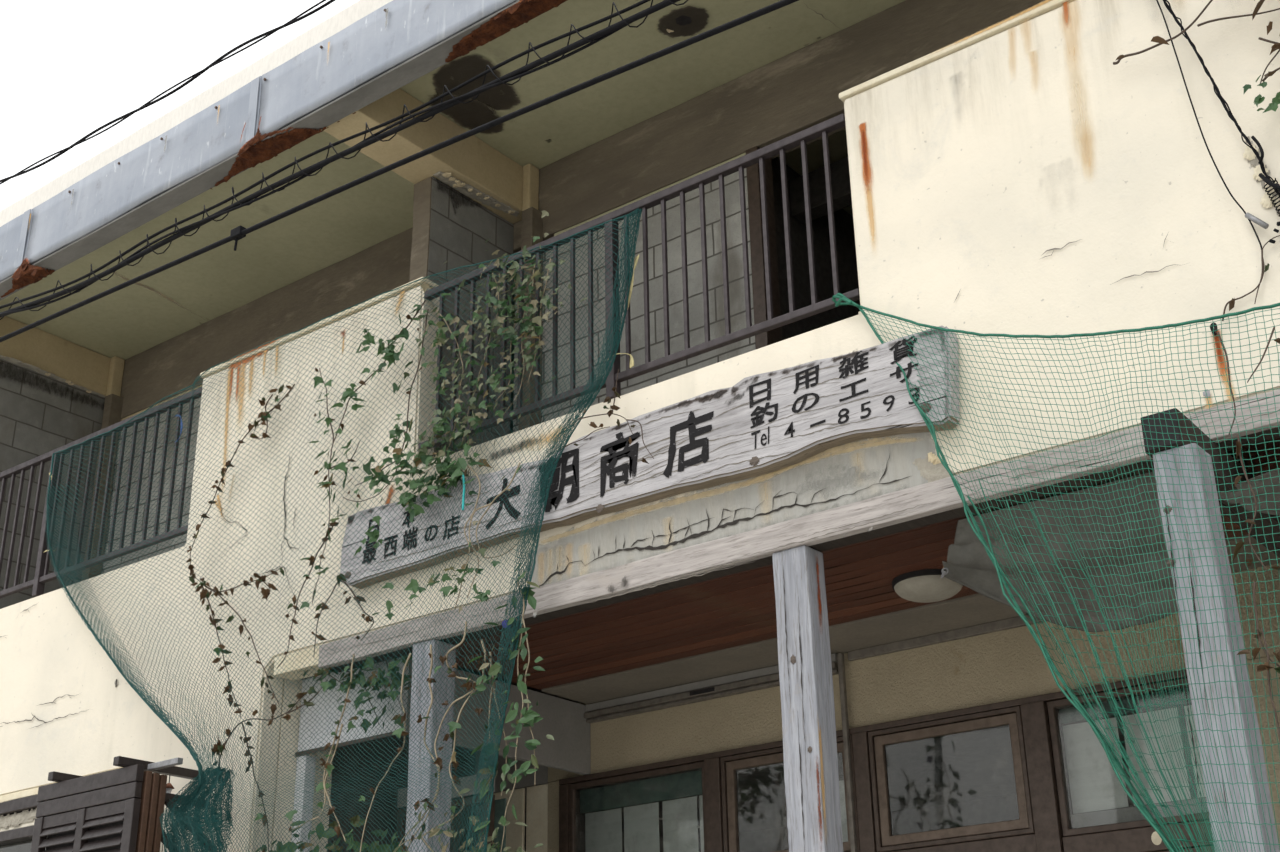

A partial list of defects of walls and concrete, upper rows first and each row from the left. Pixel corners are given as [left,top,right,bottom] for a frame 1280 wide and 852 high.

corrosion [859,123,874,236]
crack [1041,239,1081,258]
crack [1110,234,1188,285]
corrosion [1214,330,1234,400]
corrosion [224,340,278,468]
crack [539,455,910,587]
crack [0,695,89,729]